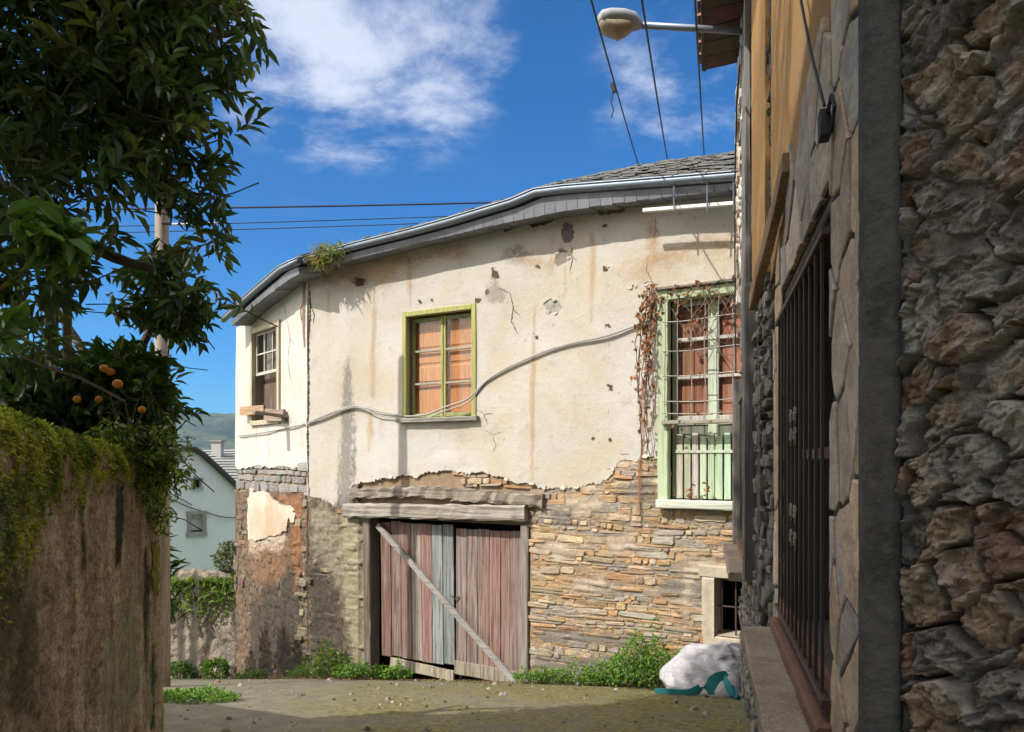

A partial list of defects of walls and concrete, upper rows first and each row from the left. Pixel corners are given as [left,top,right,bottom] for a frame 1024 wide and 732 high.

peeling [475,267,503,303]
spalling [530,220,576,267]
spalling [544,299,563,315]
leakage [337,364,356,505]
leakage [115,485,124,566]
leakage [104,540,161,730]
peeling [247,483,364,679]
flaking render [452,453,733,687]